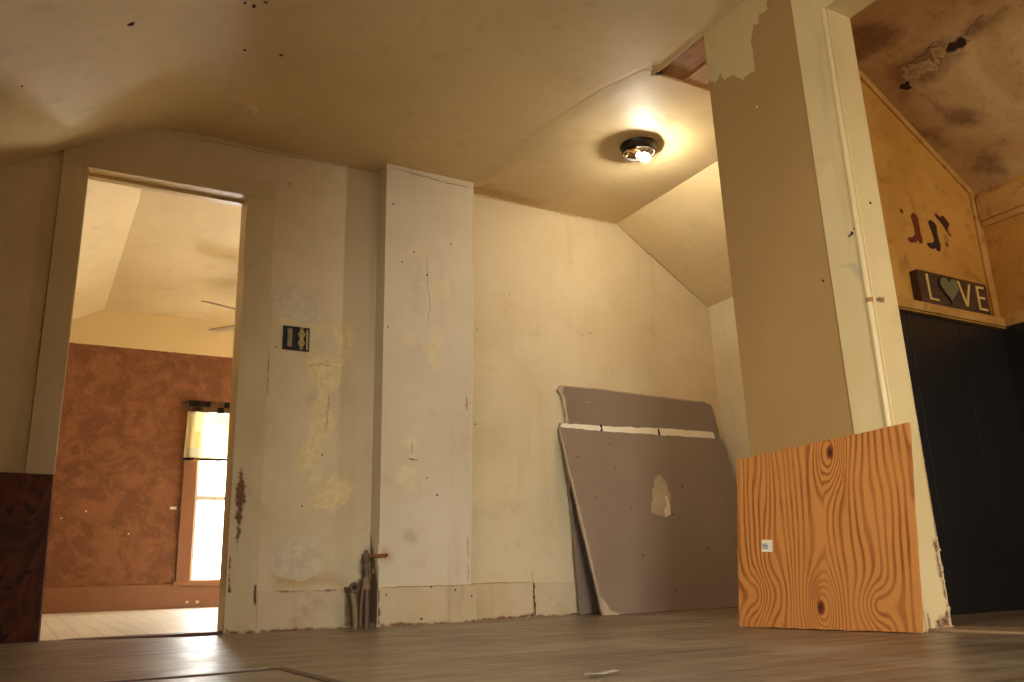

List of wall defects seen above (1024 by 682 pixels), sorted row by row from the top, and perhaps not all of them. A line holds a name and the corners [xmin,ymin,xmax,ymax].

peeling [704,0,768,83]
damp [851,2,1015,107]
peeling [896,15,984,93]
damp [910,101,1012,187]
peeling [911,385,954,632]